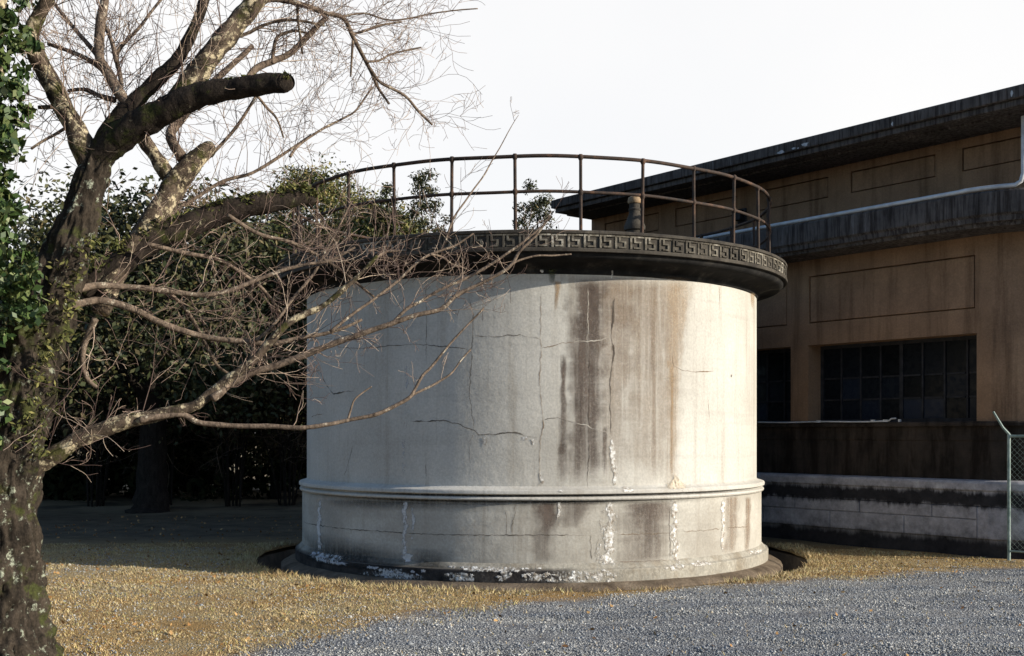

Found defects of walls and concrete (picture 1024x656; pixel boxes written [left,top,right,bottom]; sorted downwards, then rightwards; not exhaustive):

crack [344,290,615,484]
leakage [561,270,657,492]
leakage [597,503,617,565]
leakage [630,500,680,564]